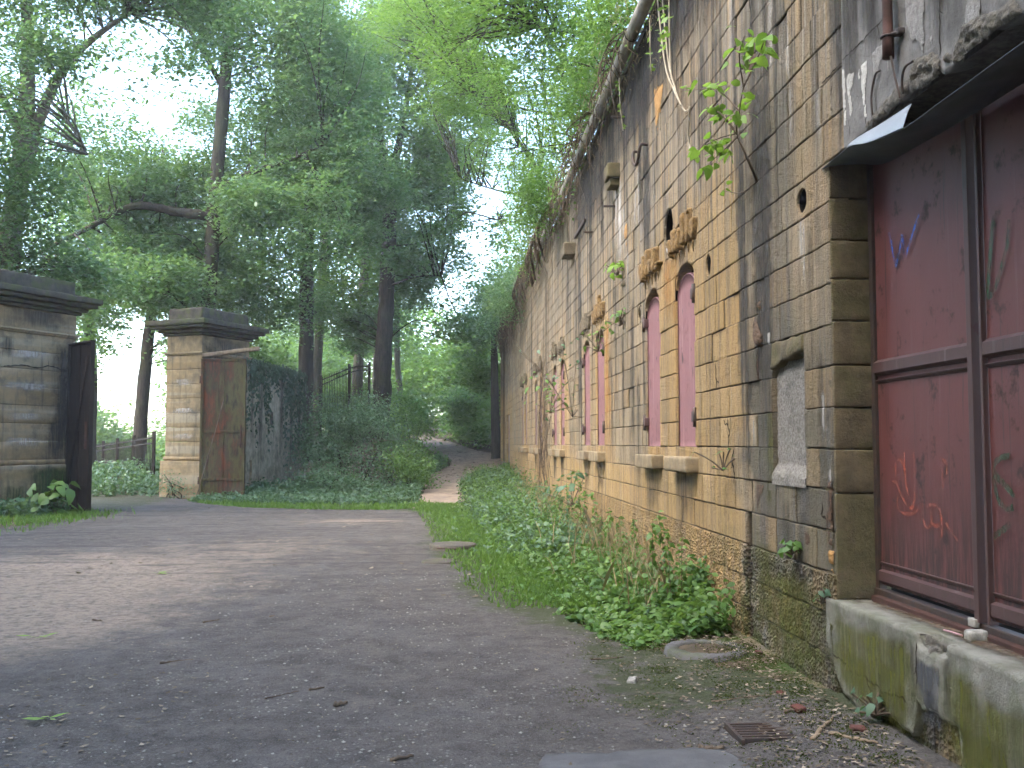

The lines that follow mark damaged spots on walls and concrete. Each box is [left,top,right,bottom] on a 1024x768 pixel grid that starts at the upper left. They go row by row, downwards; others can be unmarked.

peeling [842,45,889,126]